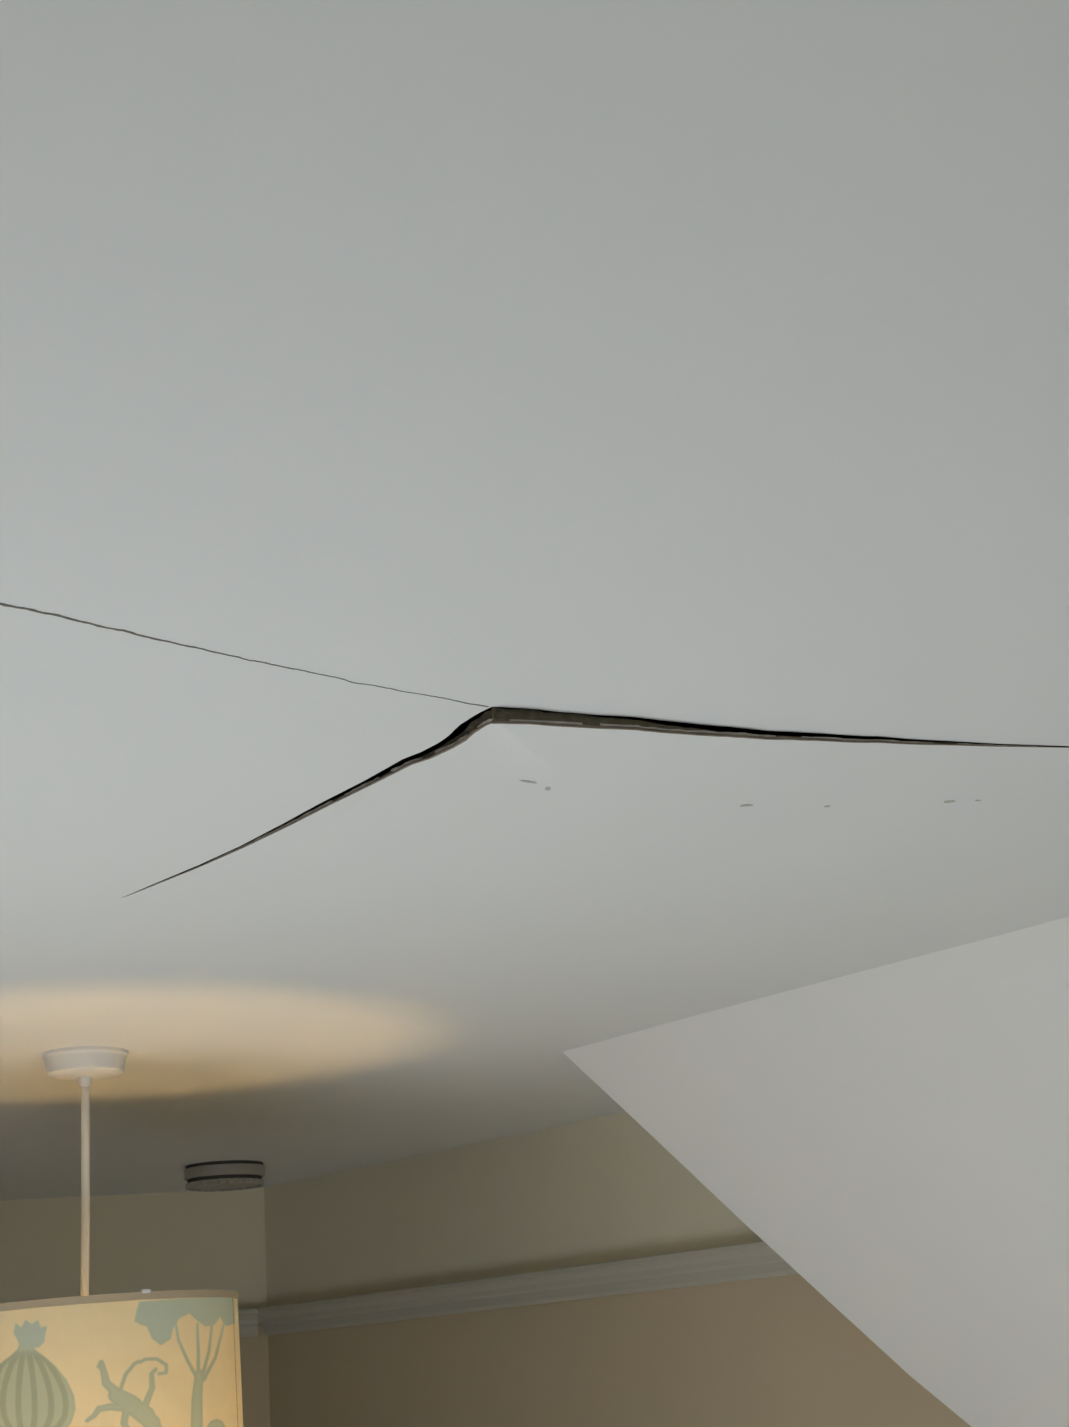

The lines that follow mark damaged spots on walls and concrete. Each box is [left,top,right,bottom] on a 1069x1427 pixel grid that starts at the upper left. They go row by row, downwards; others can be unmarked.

crack [0,603,1069,898]